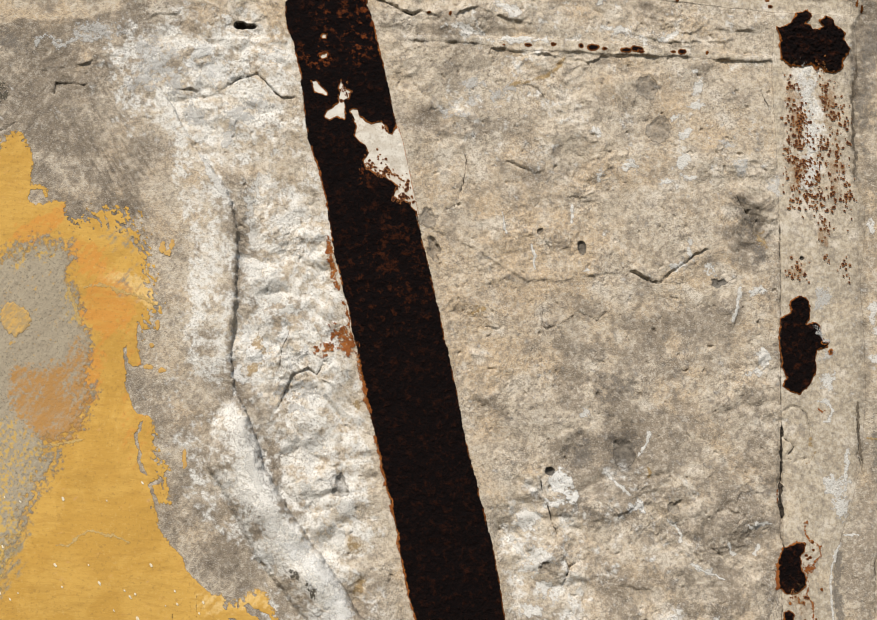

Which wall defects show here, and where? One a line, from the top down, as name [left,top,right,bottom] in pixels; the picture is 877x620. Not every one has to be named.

corrosion [578,43,608,51]
corrosion [620,45,645,53]
corrosion [776,9,857,242]
peeling [0,130,278,620]
corrosion [285,0,505,620]
corrosion [778,296,833,395]
crack [777,425,794,548]
corrosion [775,521,822,620]